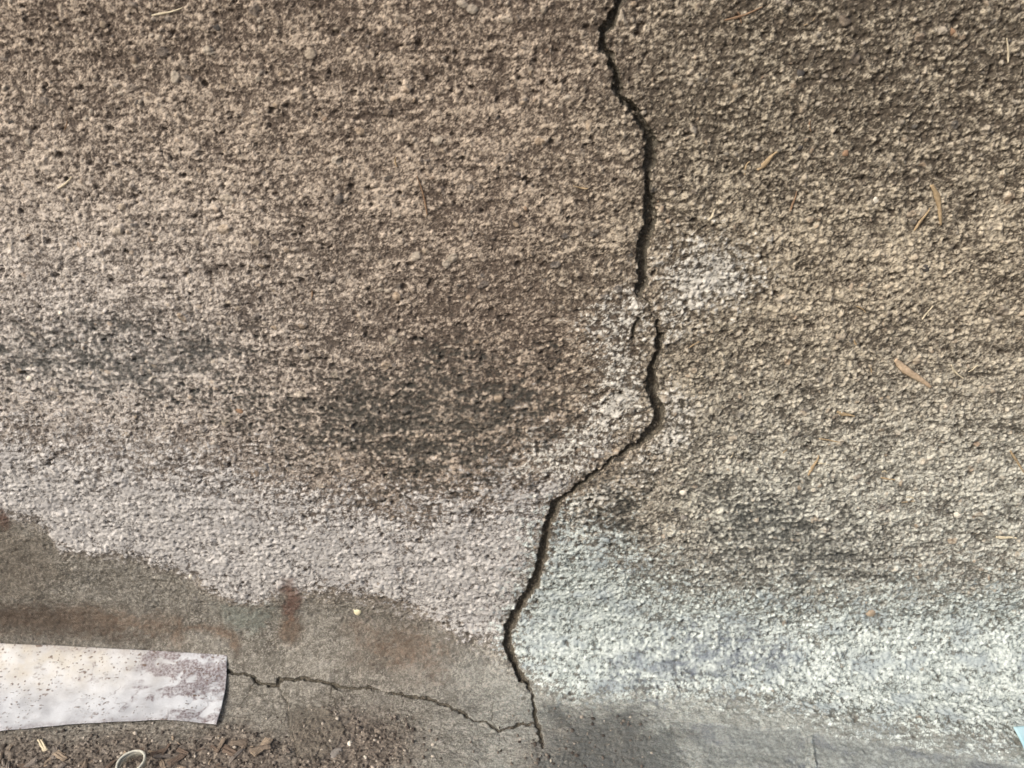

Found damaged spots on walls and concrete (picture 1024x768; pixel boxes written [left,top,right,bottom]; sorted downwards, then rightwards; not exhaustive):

crack [227,0,665,749]
damp [0,216,1024,768]